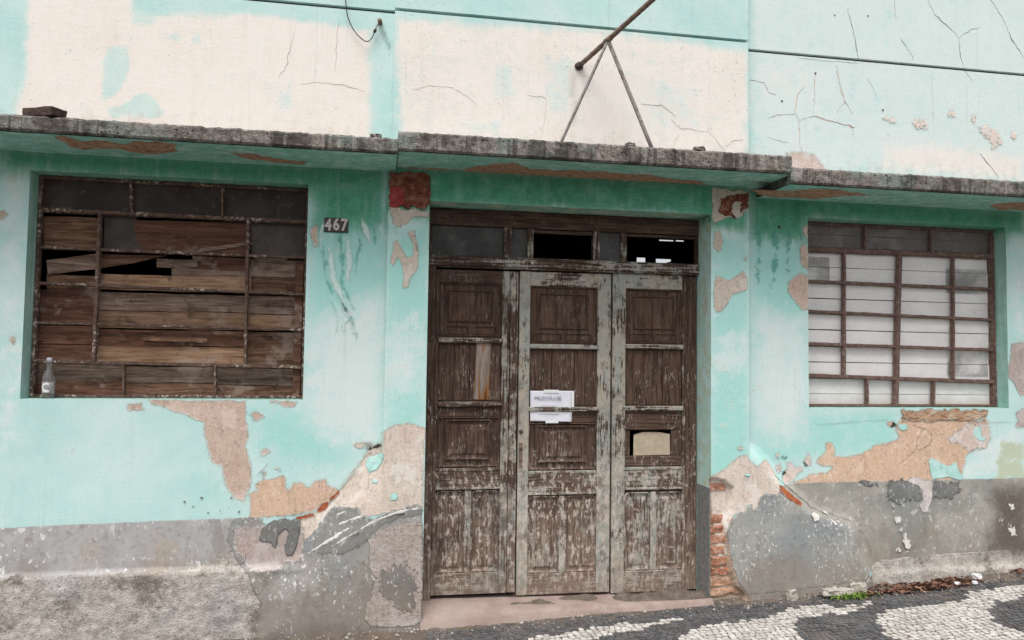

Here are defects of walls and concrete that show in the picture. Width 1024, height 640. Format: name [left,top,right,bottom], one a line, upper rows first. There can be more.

crack [755,14,876,149]
rust [54,135,178,155]
rust [229,152,307,165]
leakage [320,219,375,335]
peeling [389,207,429,288]
rust [387,163,706,210]
peeling [711,187,749,252]
peeling [713,256,748,312]
peeling [787,226,809,310]
peeling [1008,341,1024,395]
spalling [126,399,426,628]
peeling [709,408,991,600]